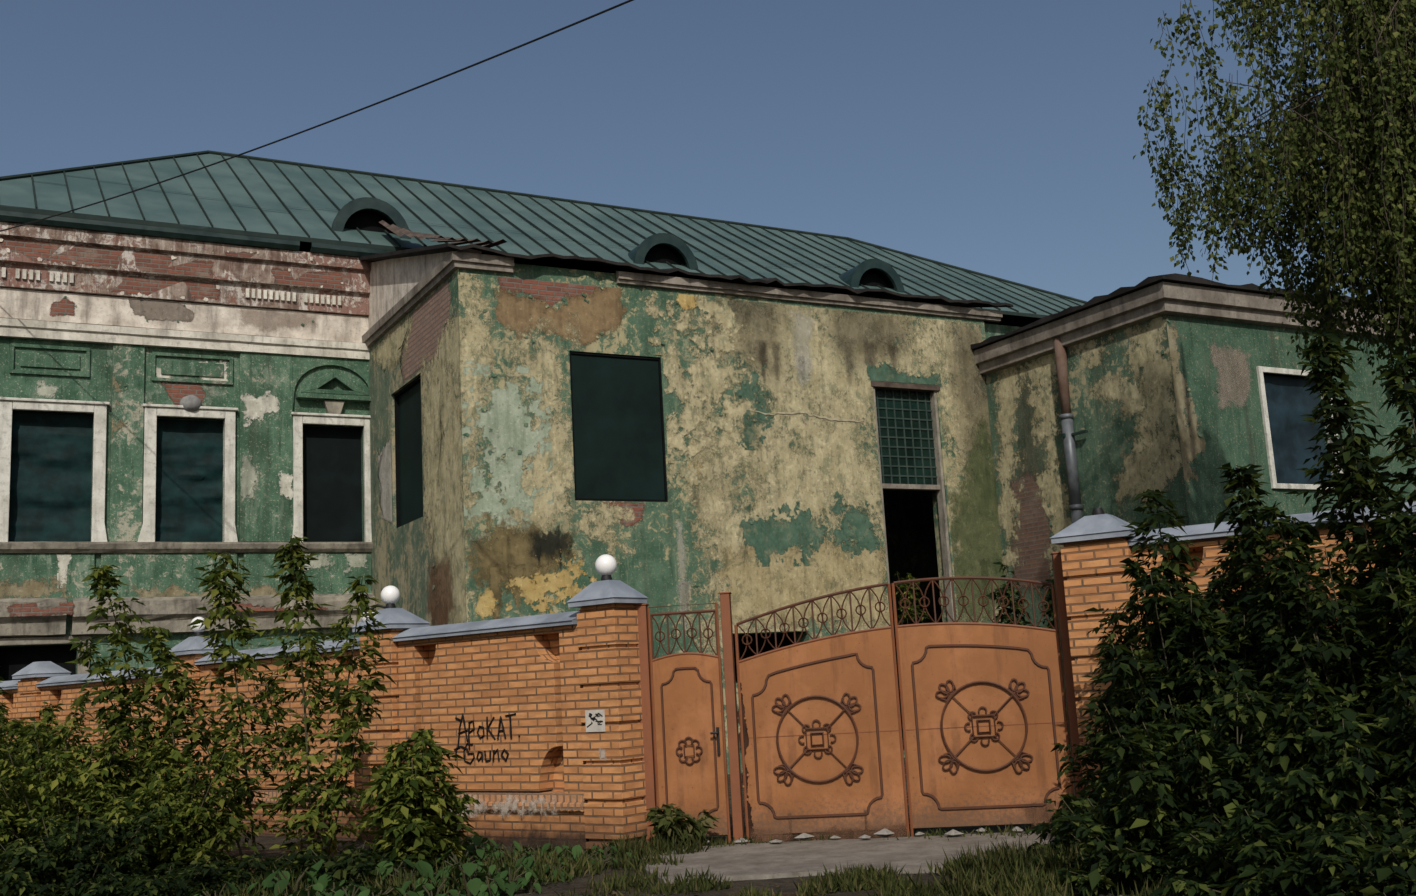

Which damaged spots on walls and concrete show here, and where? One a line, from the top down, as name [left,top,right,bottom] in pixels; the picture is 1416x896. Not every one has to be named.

flaking render [0,238,259,322]
peeling [370,273,646,624]
water stain [465,513,583,619]
peeling [646,293,1205,655]